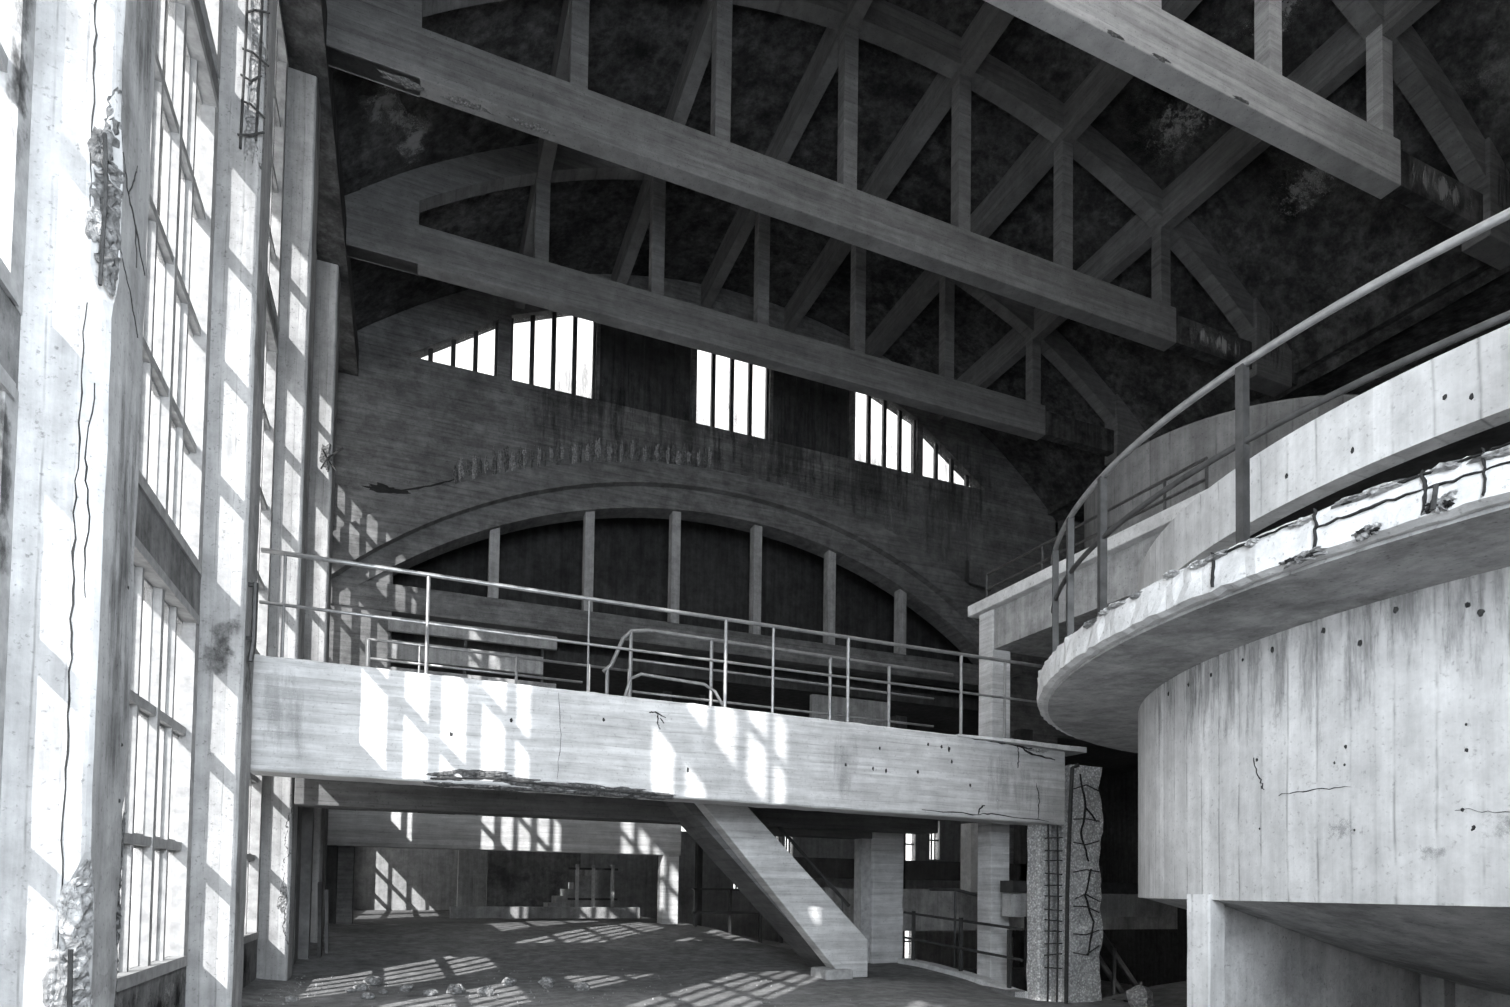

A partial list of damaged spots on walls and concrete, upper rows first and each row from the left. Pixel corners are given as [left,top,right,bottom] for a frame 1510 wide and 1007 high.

spalling [85,87,126,297]
spalling [1162,538,1261,580]
spalling [1288,517,1313,529]
spalling [1278,546,1328,569]
spalling [1351,522,1382,542]
spalling [1331,478,1406,509]
spalling [1420,445,1510,516]
crack [57,302,95,949]
crack [1253,758,1347,796]
crack [922,738,1101,956]
spalling [42,858,94,1007]
spalling [114,812,185,1007]